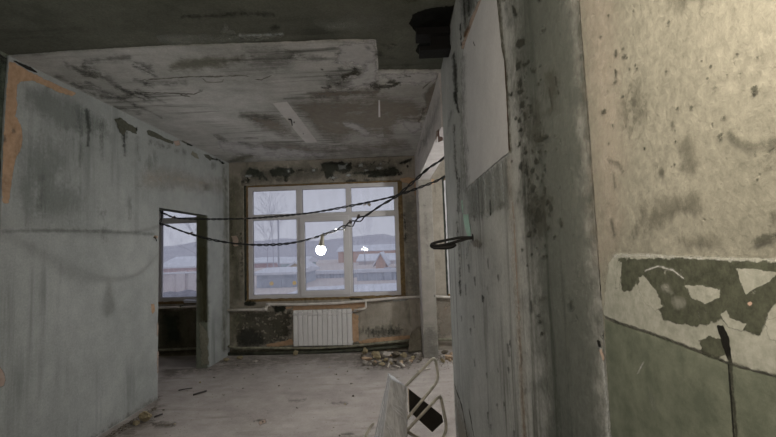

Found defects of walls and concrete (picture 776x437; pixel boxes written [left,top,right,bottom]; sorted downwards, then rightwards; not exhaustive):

flaking render [2,62,76,203]
spalling [114,118,137,135]
spalling [147,130,224,164]
water stain [474,0,601,437]
peeling [604,253,776,375]